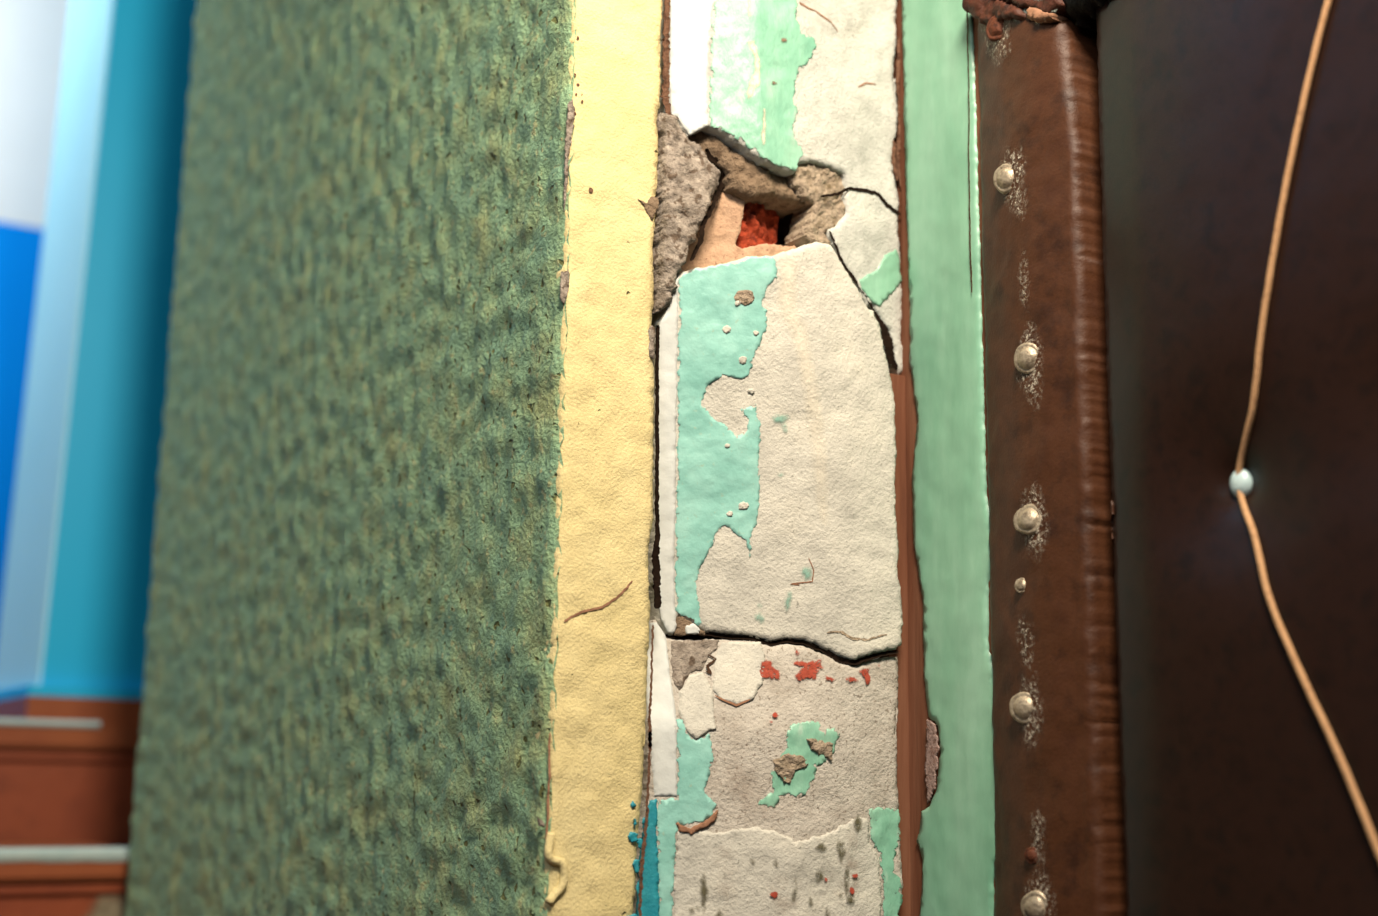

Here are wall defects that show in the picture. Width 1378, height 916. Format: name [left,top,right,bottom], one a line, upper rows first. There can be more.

crack [660,0,679,120]
crack [821,37,902,269]
crack [829,231,898,370]
peeling [638,0,903,916]
crack [564,325,898,916]